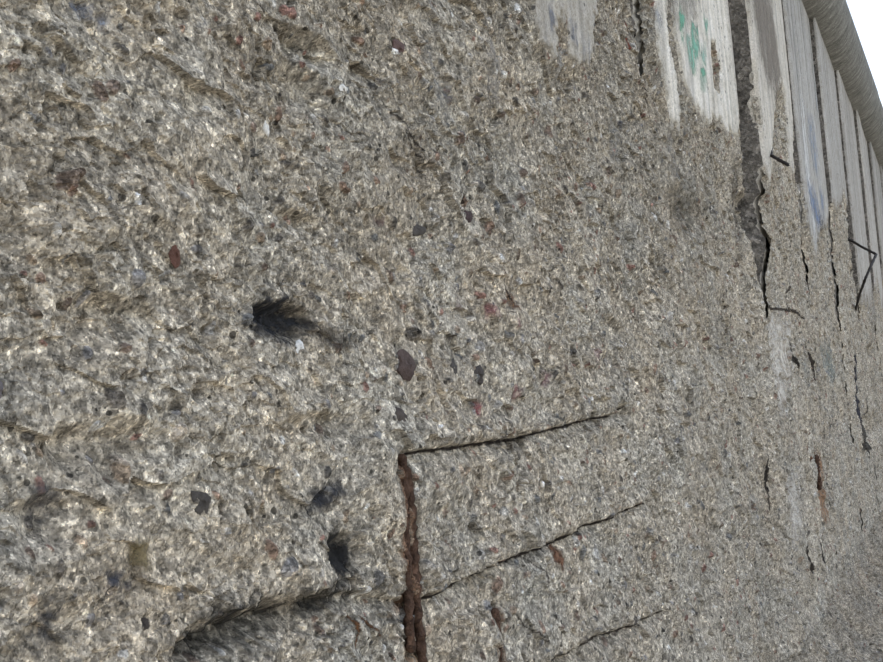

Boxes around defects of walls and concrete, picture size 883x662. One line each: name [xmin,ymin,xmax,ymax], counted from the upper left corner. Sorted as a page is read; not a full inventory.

spalling [0,0,428,662]
spalling [375,0,883,662]
crack [404,391,628,468]
crack [854,355,871,472]
corrosion [394,465,422,608]
crack [421,503,644,599]
crack [517,611,662,661]